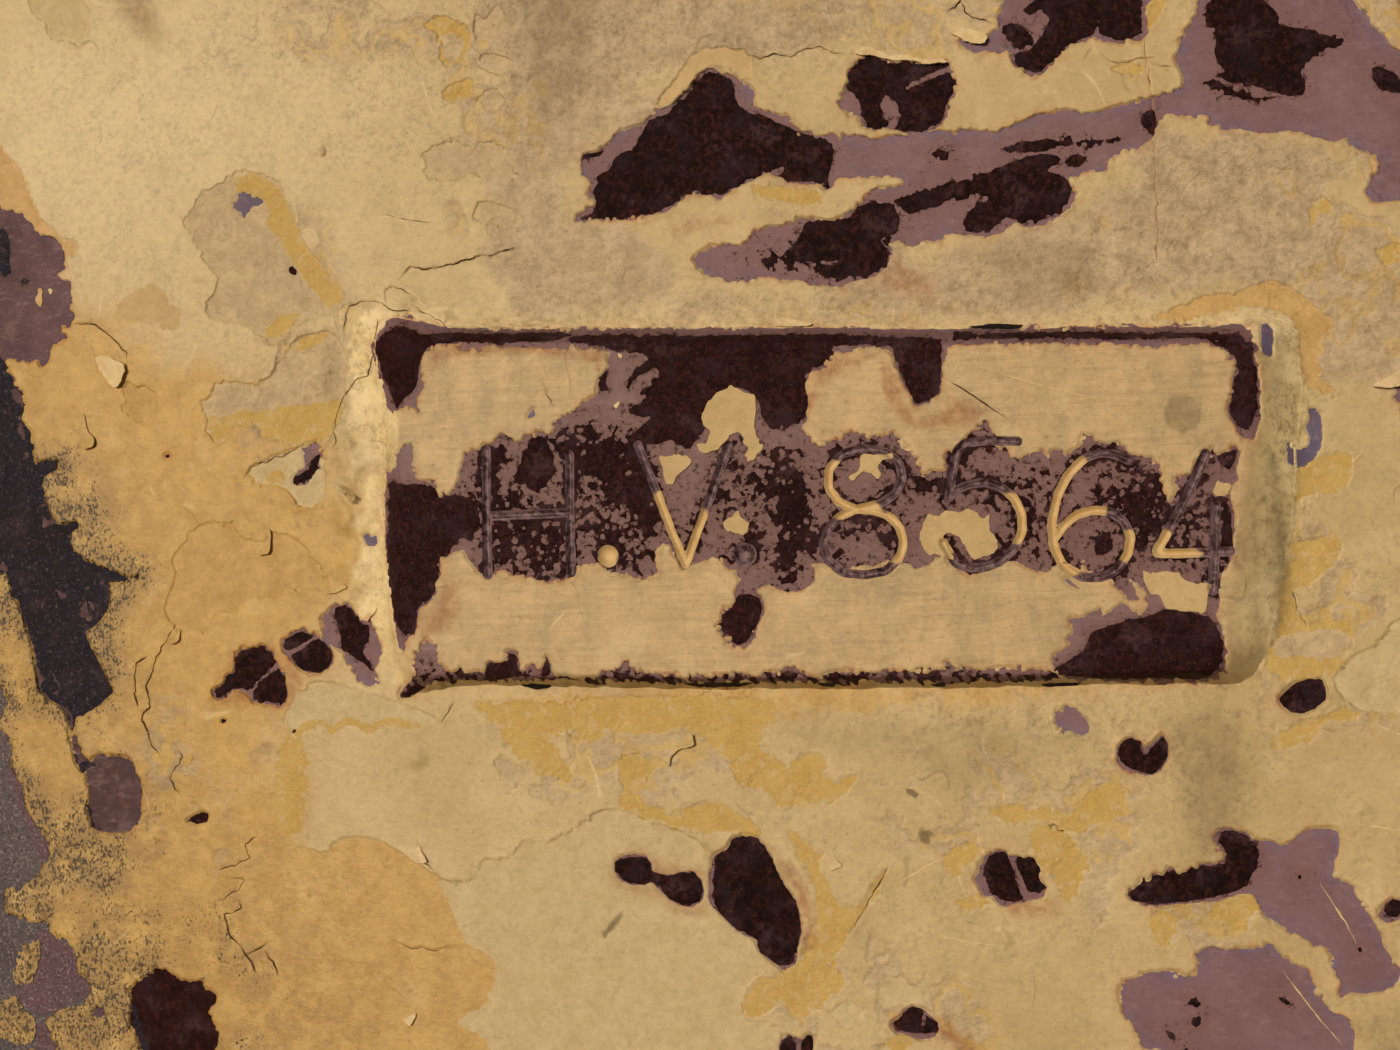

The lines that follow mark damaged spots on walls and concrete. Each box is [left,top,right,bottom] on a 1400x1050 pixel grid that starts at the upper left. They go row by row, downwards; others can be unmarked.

peeling [576,0,1400,287]
peeling [0,146,78,382]
peeling [183,169,344,342]
peeling [95,356,125,388]
rust [1373,370,1400,403]
peeling [226,280,1355,1050]
rust [1117,735,1168,775]
rust [614,836,801,970]
rust [975,850,1046,907]
rust [130,968,219,1050]